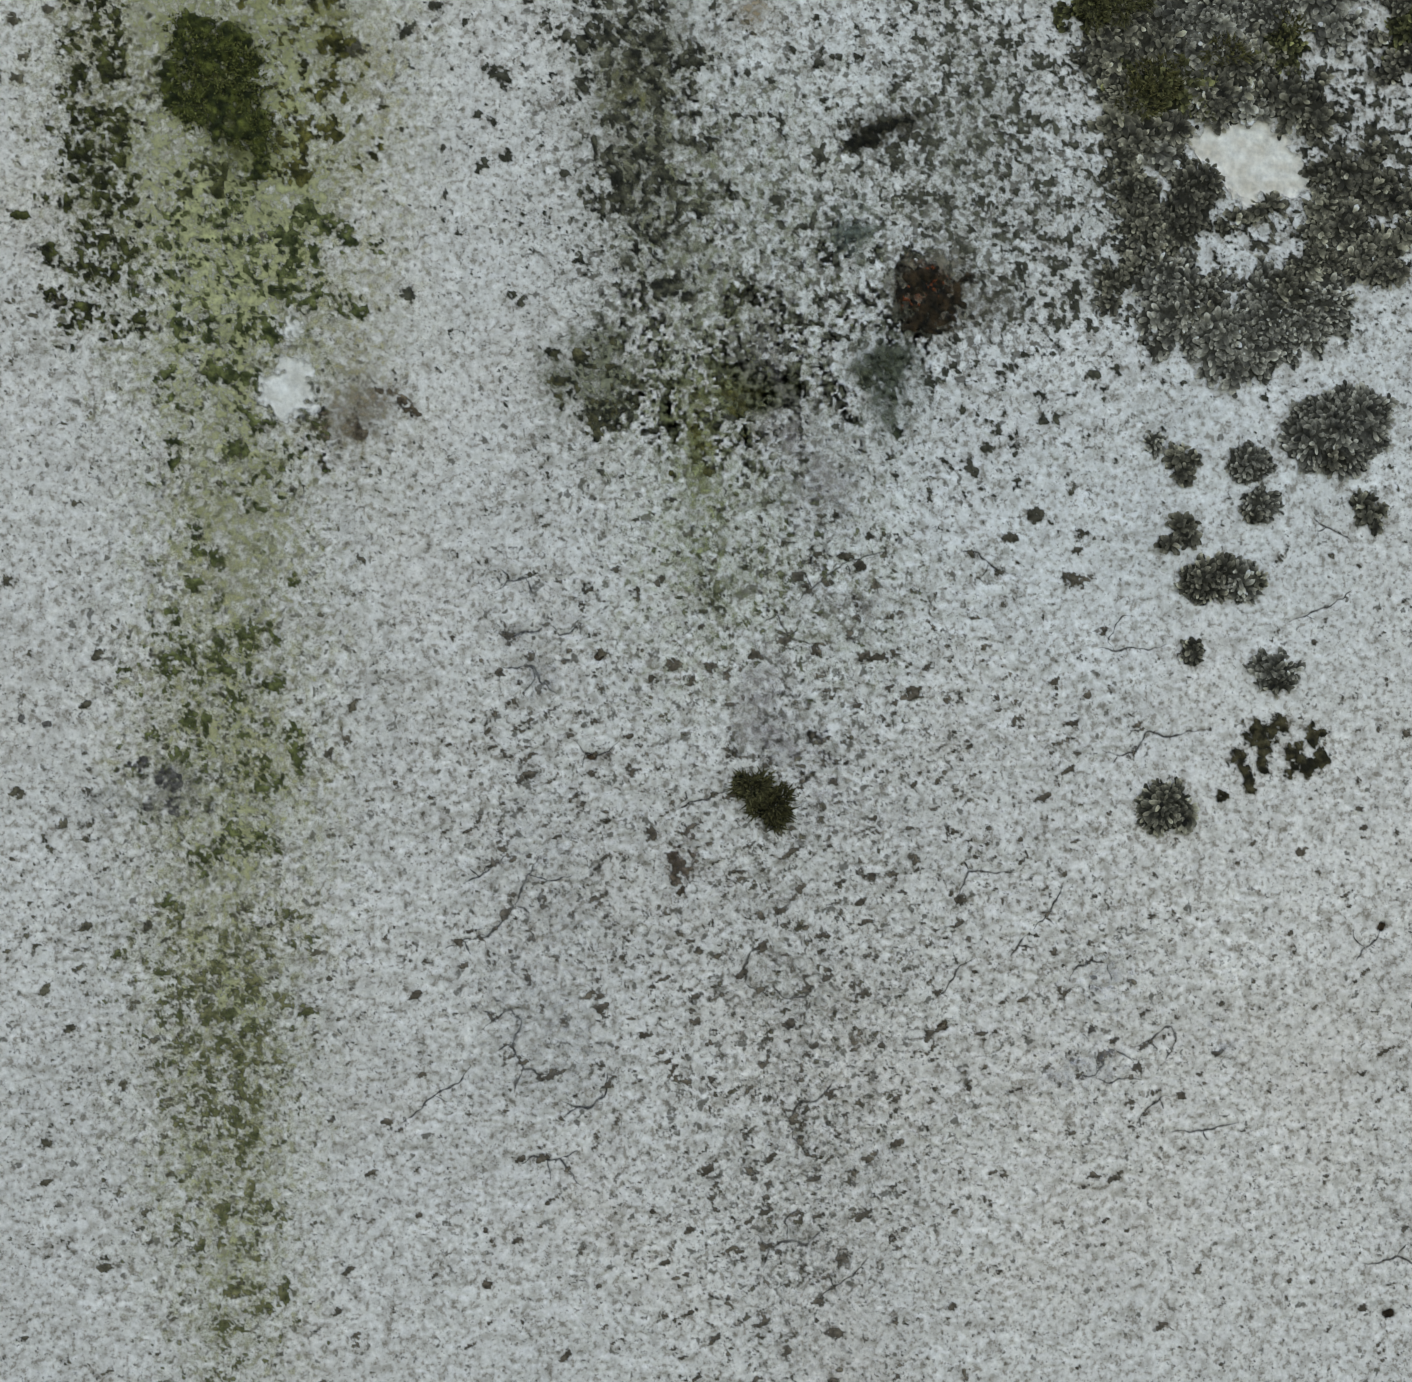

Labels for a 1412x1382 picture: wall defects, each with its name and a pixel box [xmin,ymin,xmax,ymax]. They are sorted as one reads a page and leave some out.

mould [839,113,939,151]
corrosion [892,242,1009,335]
leakage [313,383,422,444]
leakage [106,0,373,1295]